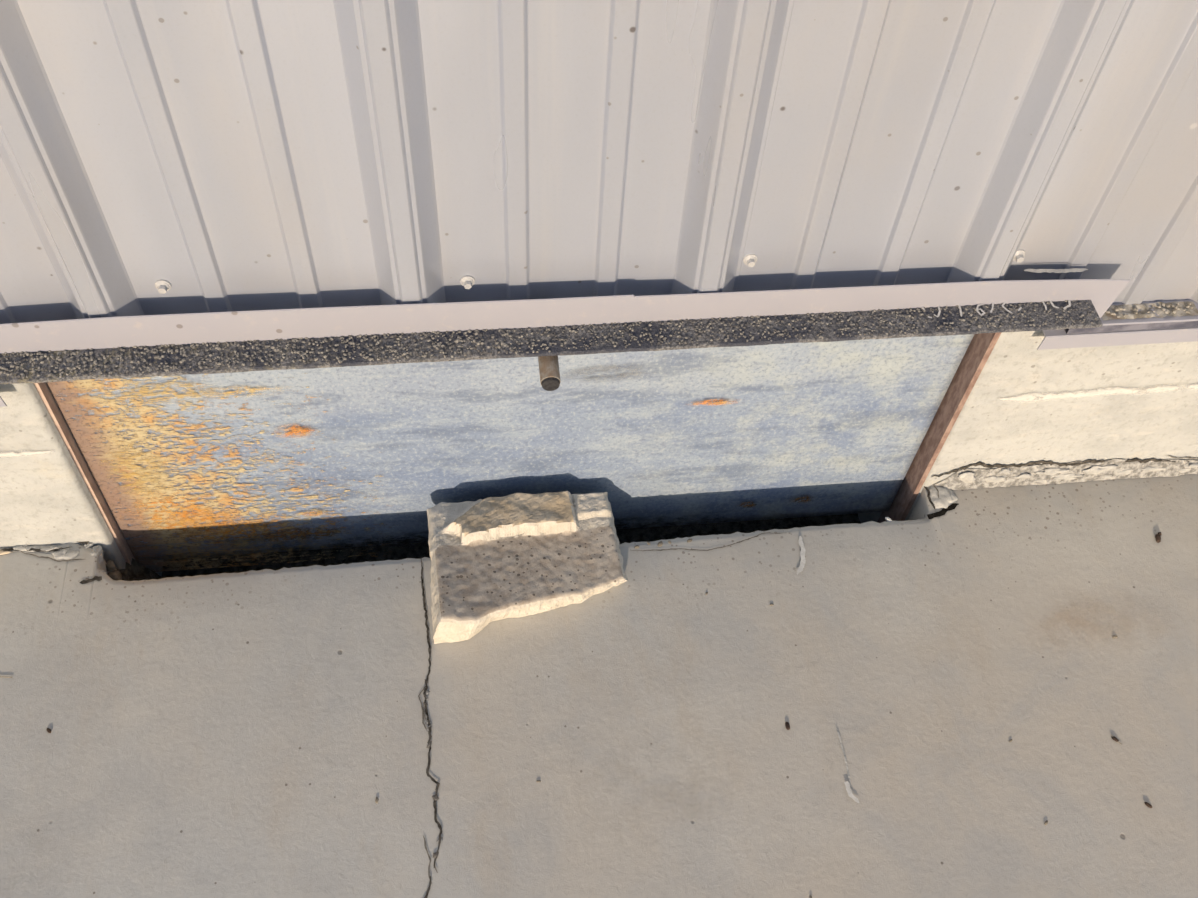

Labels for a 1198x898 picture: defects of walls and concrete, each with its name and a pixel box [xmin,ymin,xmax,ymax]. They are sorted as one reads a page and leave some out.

crack [0,544,84,562]
corrosion [46,373,391,572]
crack [929,456,1198,490]
crack [418,556,443,898]